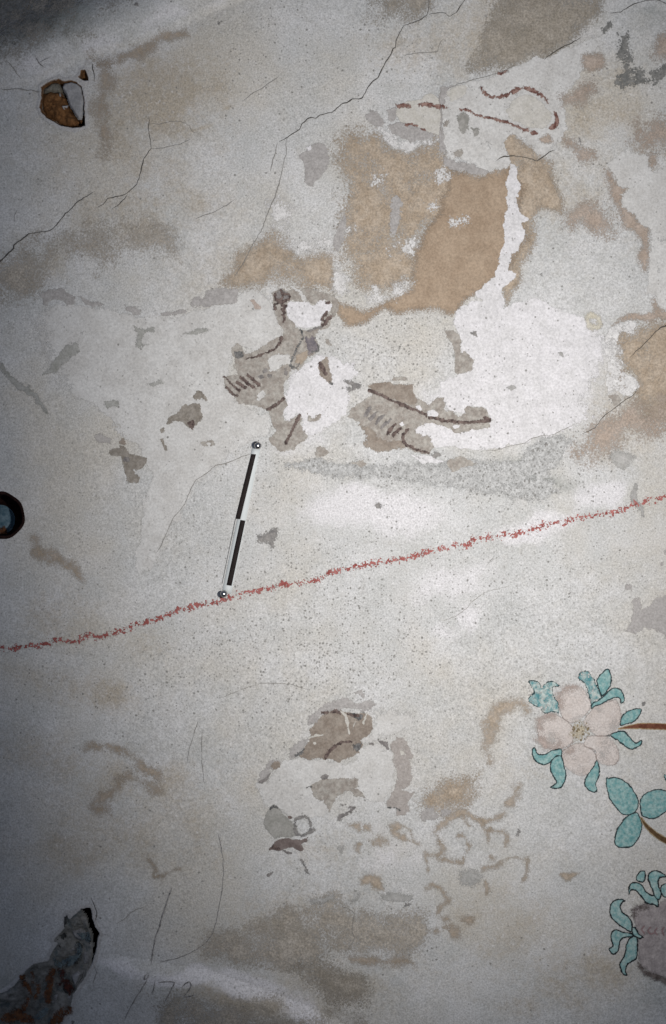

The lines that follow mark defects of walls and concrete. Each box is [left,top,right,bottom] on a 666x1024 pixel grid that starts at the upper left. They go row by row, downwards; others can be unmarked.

spalling [36,66,91,133]
crack [0,120,195,262]
peeling [299,143,330,187]
crack [234,0,465,277]
peeling [386,194,418,258]
peeling [365,85,489,185]
peeling [506,95,552,129]
peeling [160,264,491,472]
peeling [604,320,640,406]
crack [484,387,638,451]
peeling [258,690,451,822]
spalling [0,904,103,1024]